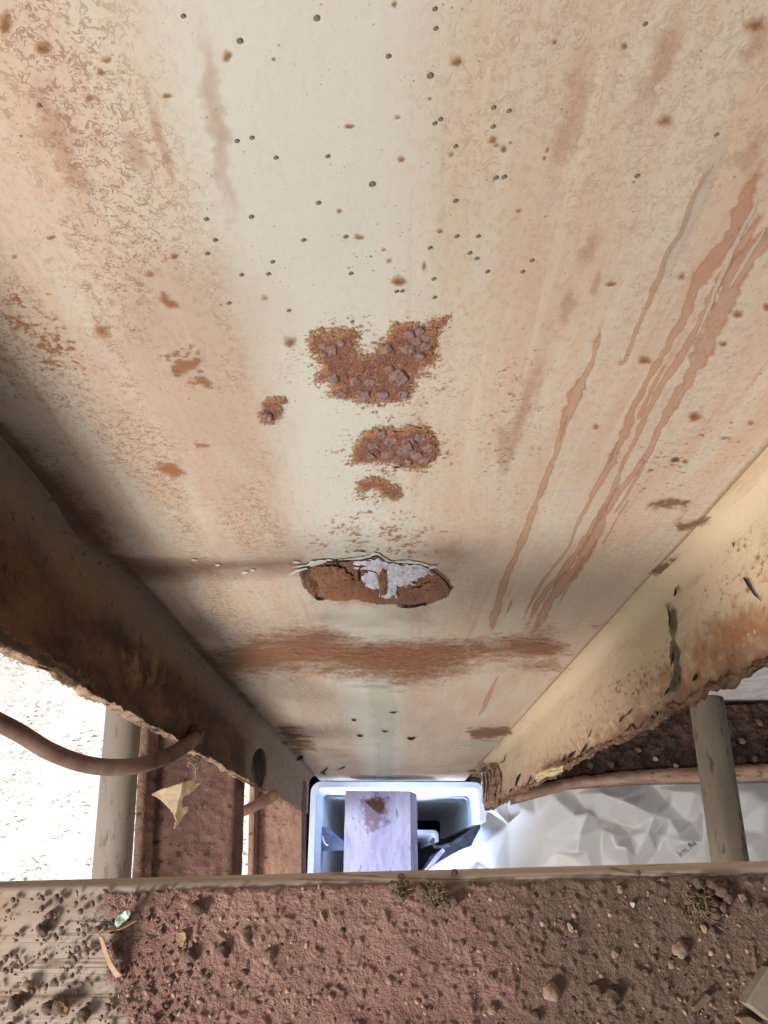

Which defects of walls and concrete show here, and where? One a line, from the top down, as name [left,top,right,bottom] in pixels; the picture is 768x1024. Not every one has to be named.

rust [164,345,219,389]
rust [256,396,287,425]
rust [285,314,462,558]
rust [641,443,692,509]
rust [676,517,709,531]
peeling [288,552,453,609]
rust [650,558,677,576]
rust [201,630,565,689]
peeling [467,762,502,808]
peeling [533,765,565,783]